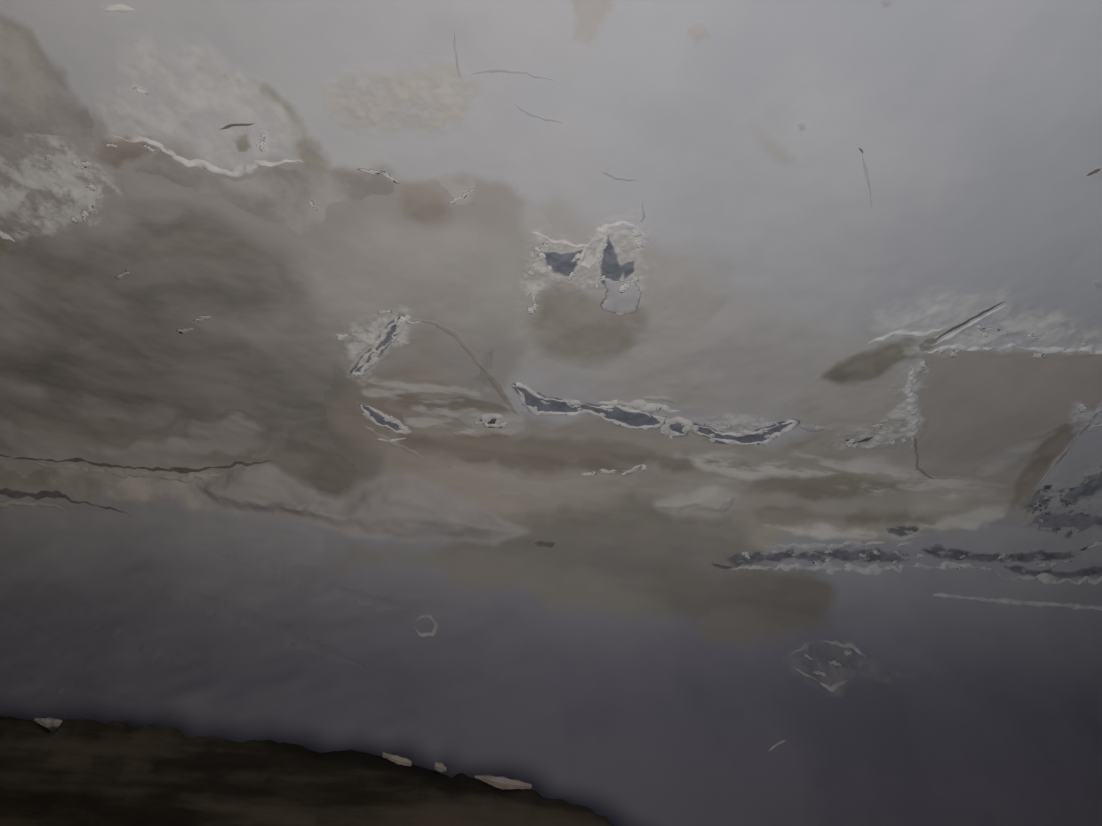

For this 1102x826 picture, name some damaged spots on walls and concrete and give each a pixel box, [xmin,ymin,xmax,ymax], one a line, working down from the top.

damp [0,4,95,153]
peeling [0,23,309,261]
peeling [511,202,660,324]
crack [0,454,272,517]
flaking render [333,304,421,387]
flaking render [357,402,429,462]
damp [0,68,1037,657]
flaking render [458,383,801,447]
peeling [823,282,1102,457]
peeling [1012,460,1102,540]